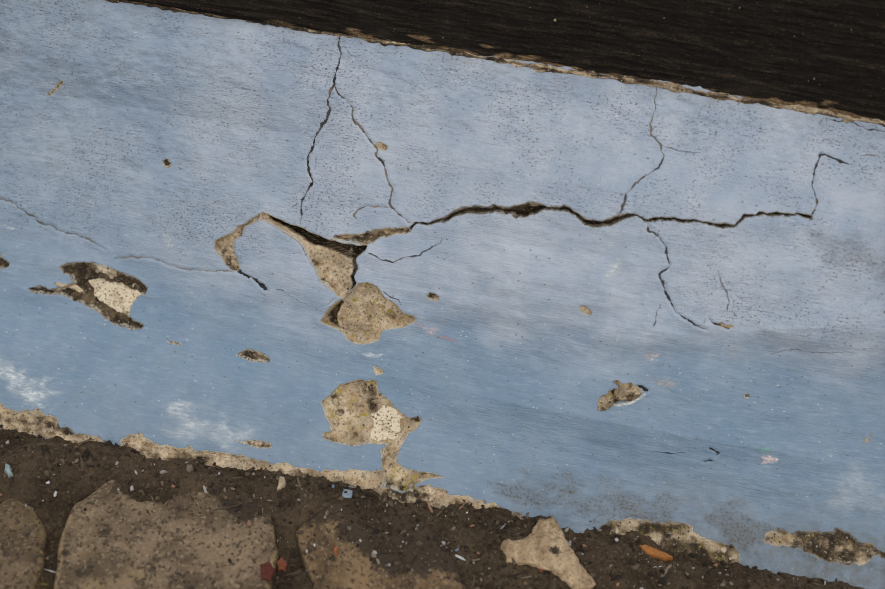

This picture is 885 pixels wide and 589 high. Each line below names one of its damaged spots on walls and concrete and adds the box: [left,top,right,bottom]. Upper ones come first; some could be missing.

crack [300,37,875,329]
crack [0,198,95,243]
spalling [28,262,148,330]
spalling [214,212,417,345]
spalling [236,348,270,363]
spalling [597,380,648,411]
spalling [120,365,522,518]
peeling [599,517,740,564]
peeling [764,527,885,566]